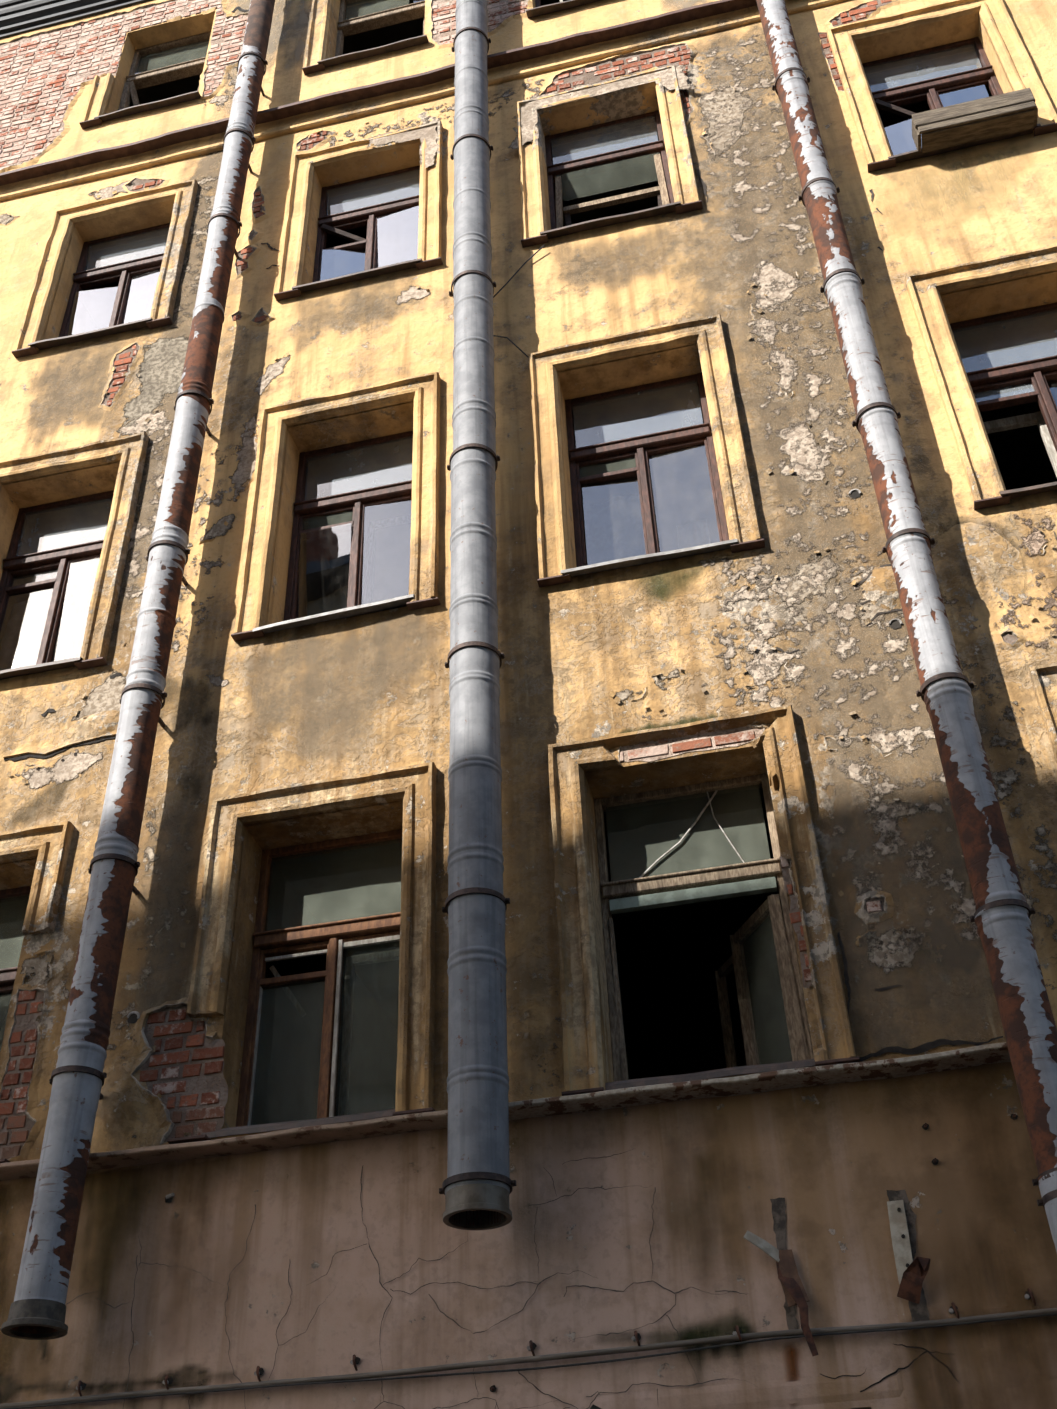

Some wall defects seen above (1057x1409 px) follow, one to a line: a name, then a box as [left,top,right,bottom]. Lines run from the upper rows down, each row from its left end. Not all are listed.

flaking render [0,0,248,173]
water stain [666,0,704,9]
flaking render [814,0,916,97]
peeling [488,33,981,990]
peeling [7,749,103,789]
peeling [71,671,127,721]
peeling [959,658,1057,958]
flaking render [0,948,69,1162]
flaking render [127,997,228,1146]
crack [66,1149,756,1409]
crack [820,1344,959,1393]